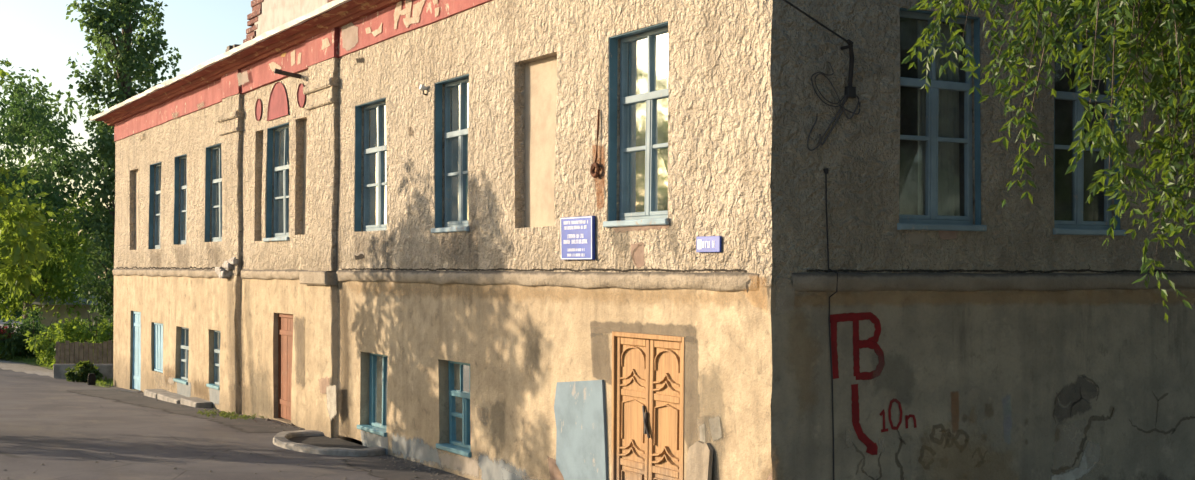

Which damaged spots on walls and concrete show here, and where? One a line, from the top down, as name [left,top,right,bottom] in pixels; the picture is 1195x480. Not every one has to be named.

spalling [243,0,264,43]
peeling [321,0,439,63]
peeling [237,71,249,86]
peeling [269,50,301,72]
spalling [1054,375,1098,422]